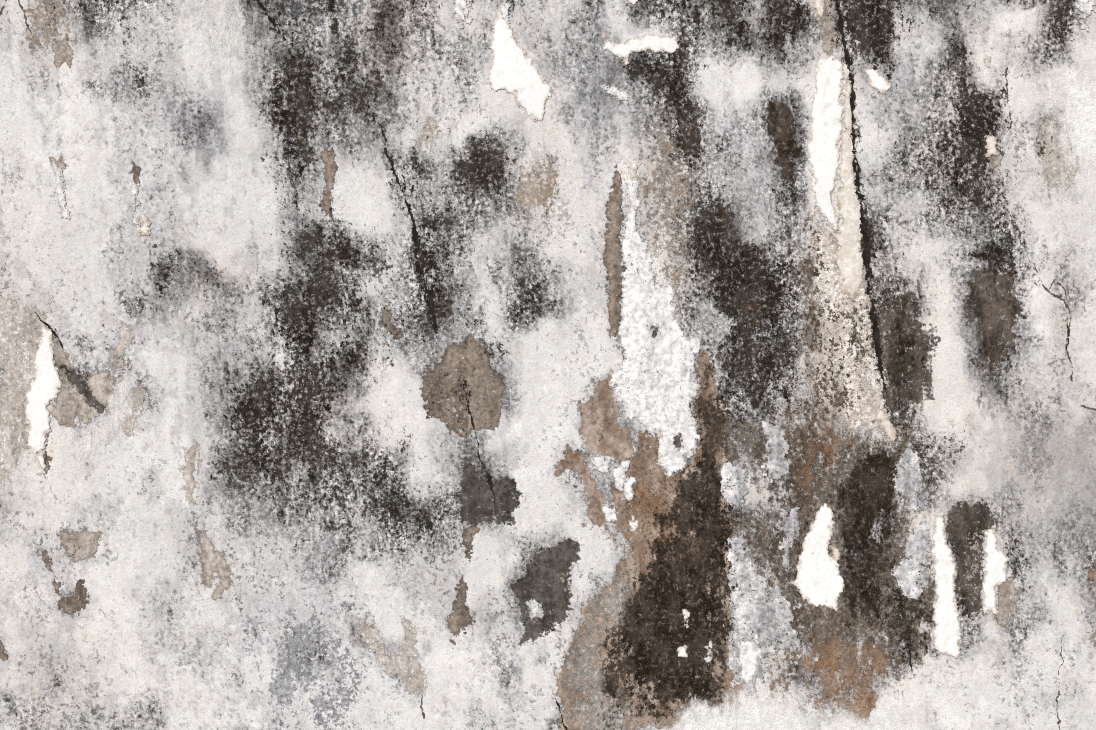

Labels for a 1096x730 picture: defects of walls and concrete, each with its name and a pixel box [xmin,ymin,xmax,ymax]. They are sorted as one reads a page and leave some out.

crack [0,0,31,33]
spalling [0,291,148,485]
leakage [203,0,562,559]
crack [378,122,439,334]
spalling [419,335,509,438]
crack [463,384,495,505]
spalling [458,456,523,562]
spalling [503,161,941,730]
leakage [599,0,965,730]
crack [835,0,898,437]
leakage [891,38,1044,307]
leakage [943,501,994,621]